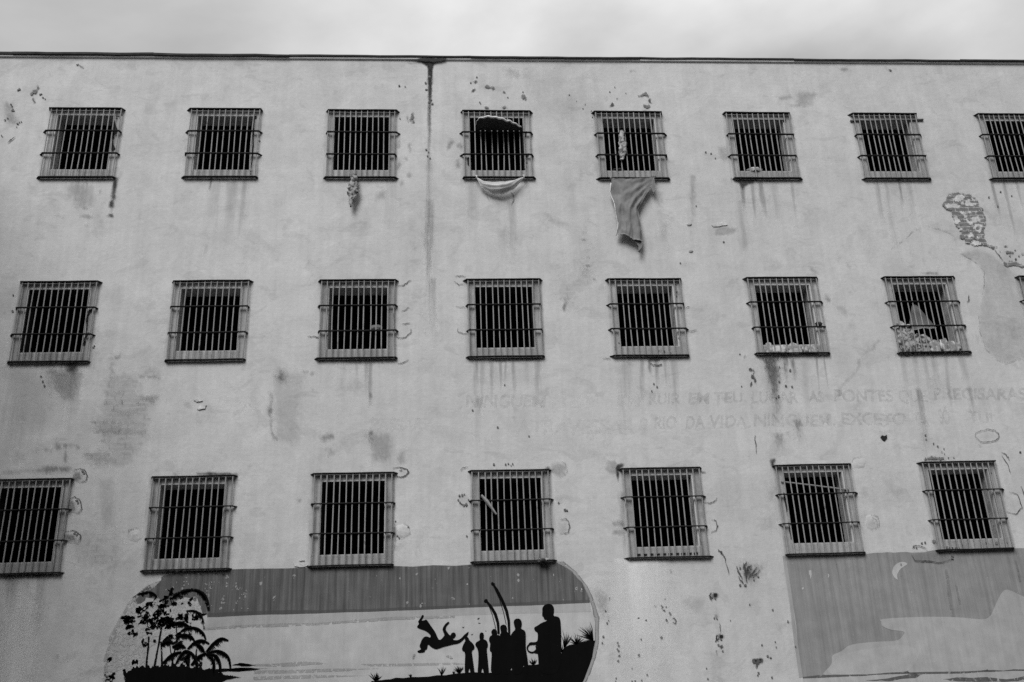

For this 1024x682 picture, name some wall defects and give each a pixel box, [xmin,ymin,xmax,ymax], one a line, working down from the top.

water stain [408,57,446,116]
flaking render [942,192,1024,268]